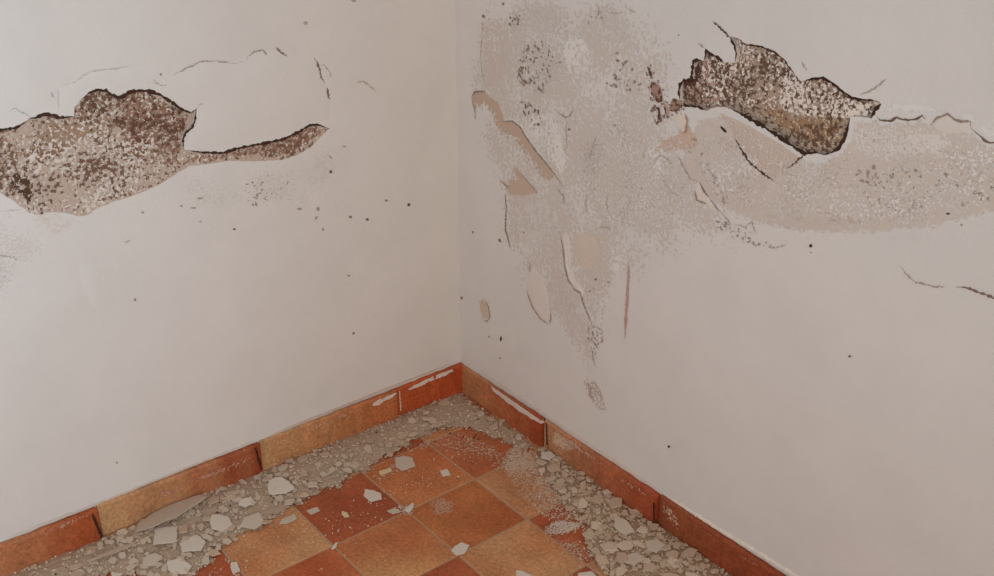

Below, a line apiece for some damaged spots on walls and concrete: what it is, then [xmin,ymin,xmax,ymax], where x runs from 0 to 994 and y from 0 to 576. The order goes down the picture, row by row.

spalling [0,88,329,216]
peeling [471,91,560,196]